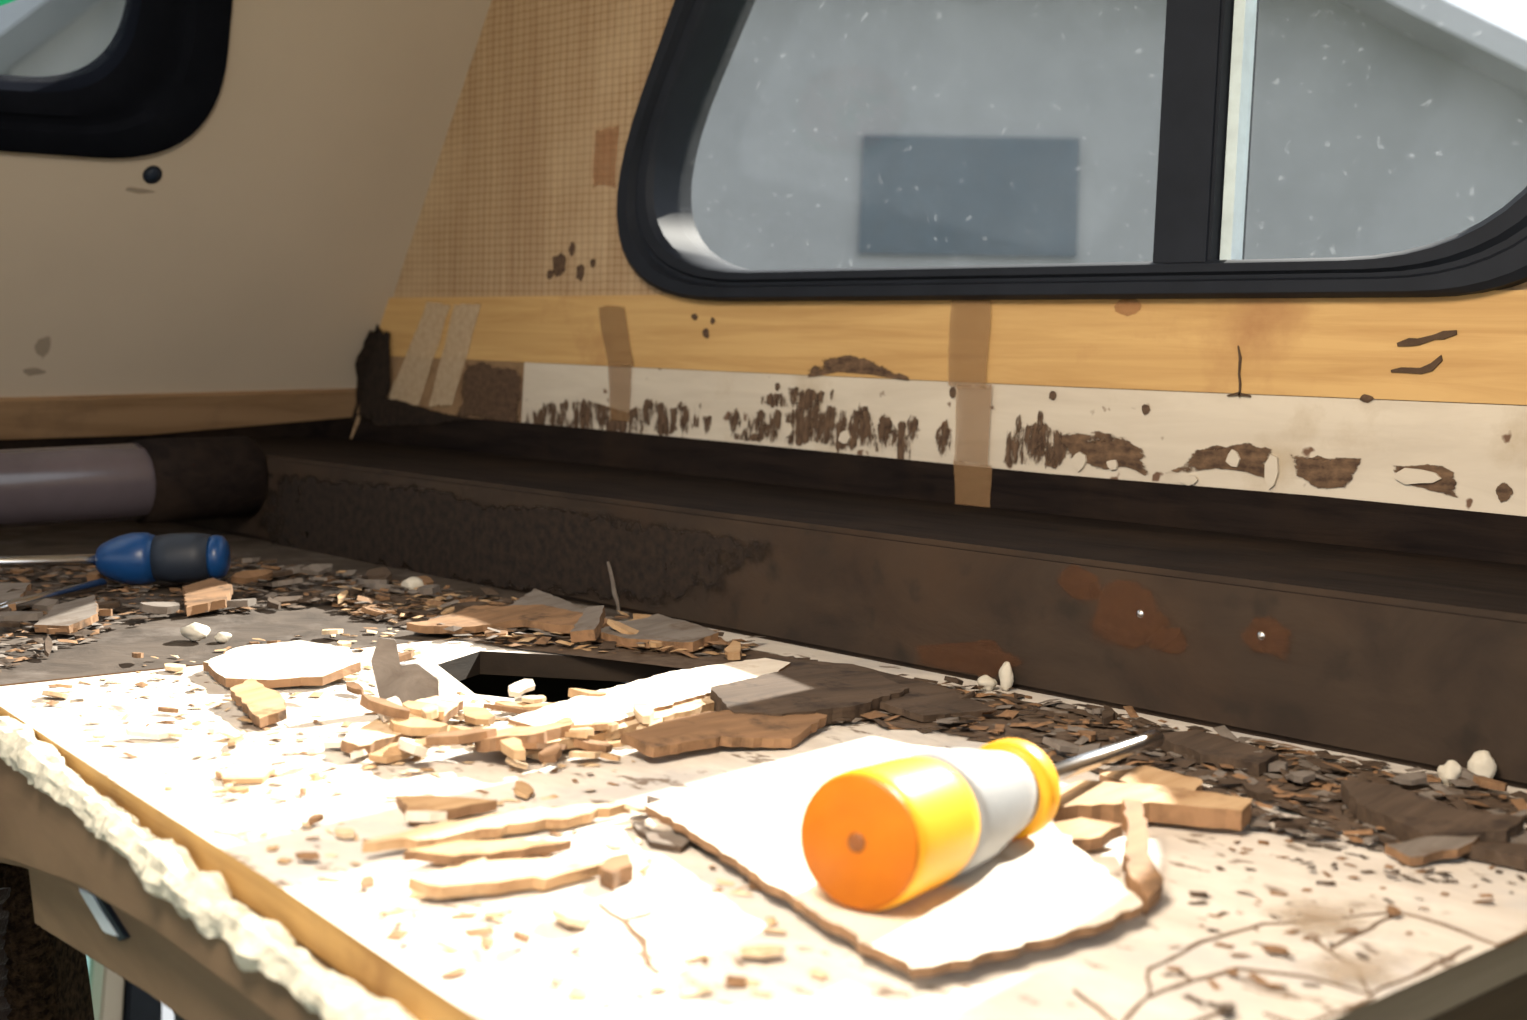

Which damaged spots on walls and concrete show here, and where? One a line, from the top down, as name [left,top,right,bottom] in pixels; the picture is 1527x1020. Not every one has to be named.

peeling [526,398,711,438]
peeling [729,387,918,459]
peeling [936,420,951,454]
peeling [1003,411,1147,476]
peeling [1171,443,1361,489]
peeling [1394,464,1457,498]
peeling [1496,483,1513,502]
crack [1073,912,1527,1020]